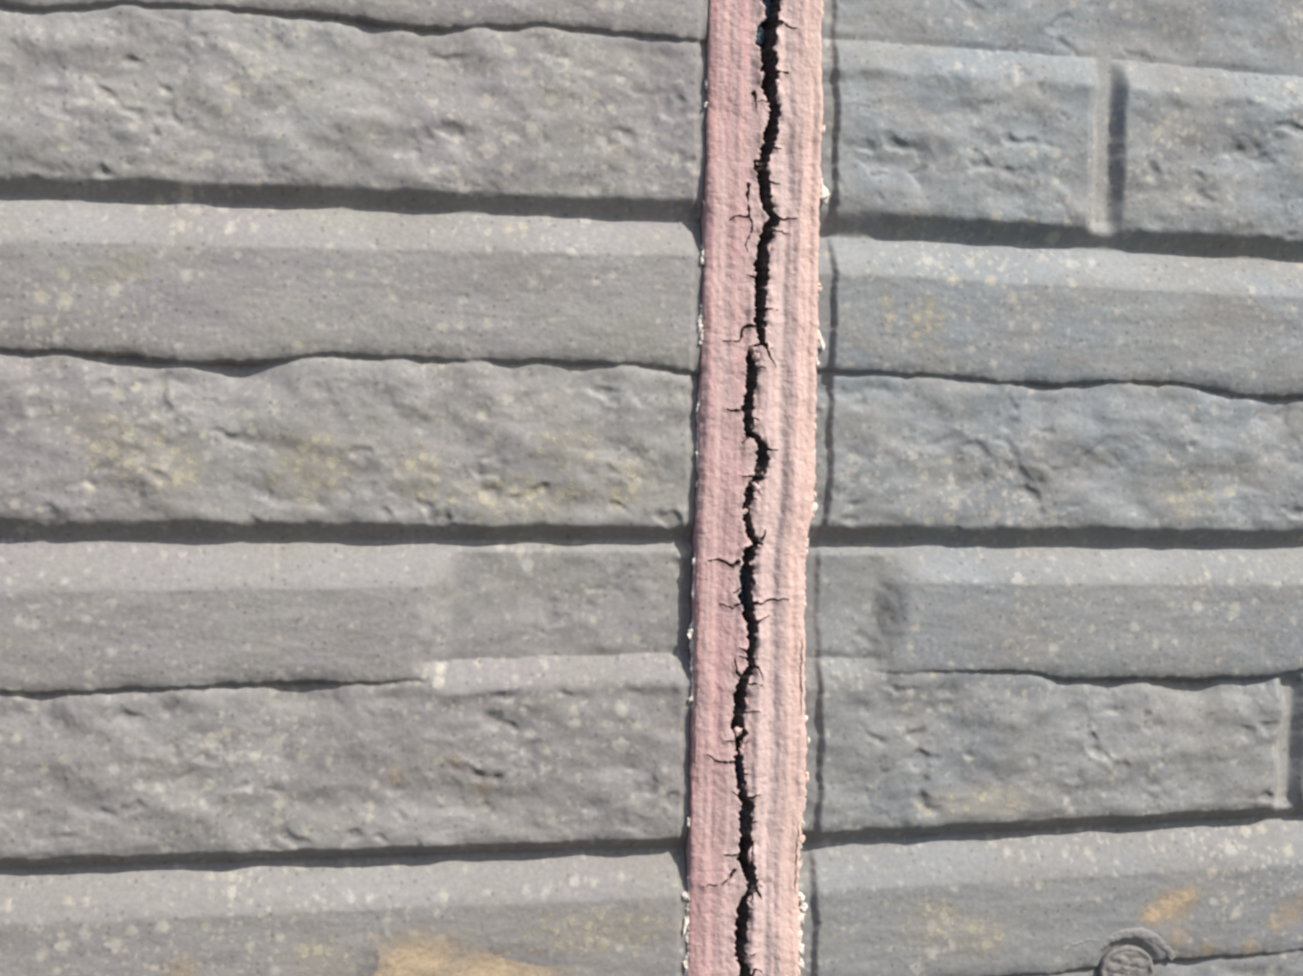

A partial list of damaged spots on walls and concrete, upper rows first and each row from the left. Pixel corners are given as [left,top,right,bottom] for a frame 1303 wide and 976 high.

crack [693,0,797,976]
crack [797,644,805,713]
crack [792,822,800,892]